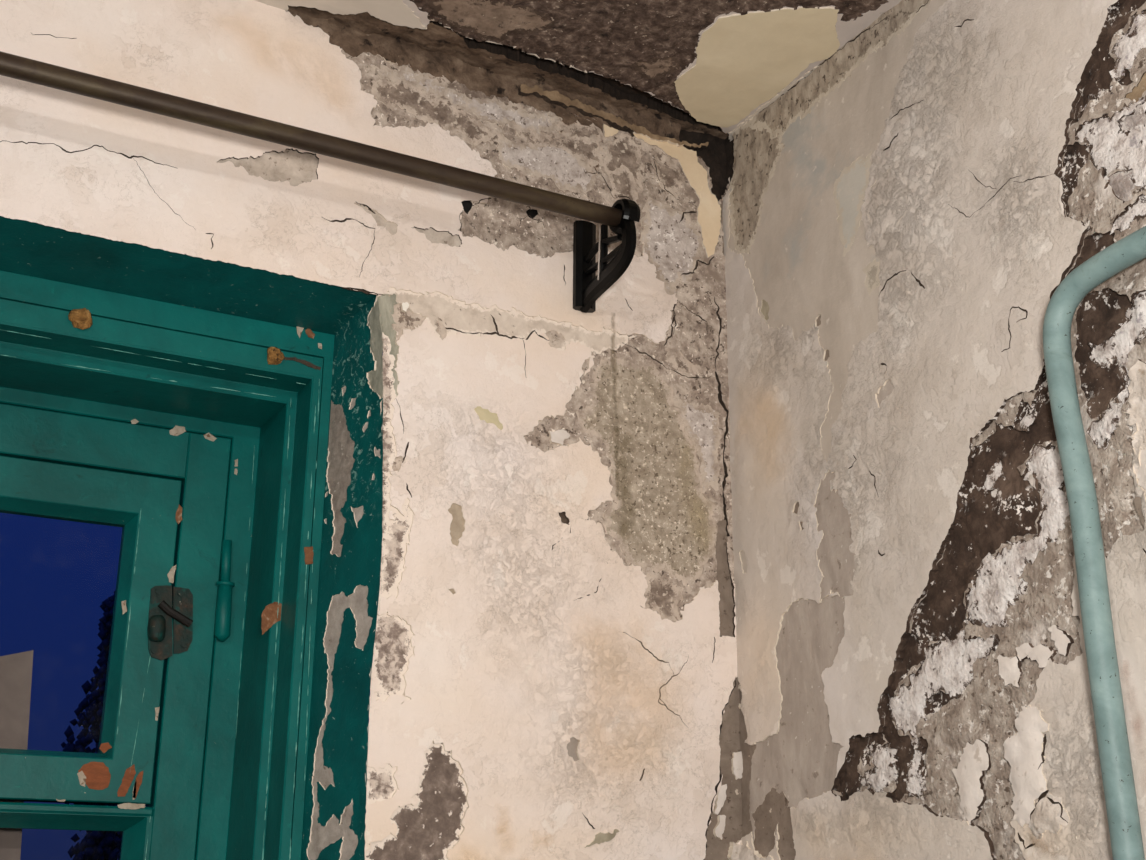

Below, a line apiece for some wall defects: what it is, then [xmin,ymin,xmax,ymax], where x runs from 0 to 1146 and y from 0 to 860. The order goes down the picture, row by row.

peeling [217,149,318,186]
crack [500,44,734,404]
flaking render [1058,0,1146,277]
peeling [169,426,186,436]
crack [640,642,685,716]
peeling [255,0,1083,860]
crack [715,465,734,637]
flaking render [1071,258,1146,556]